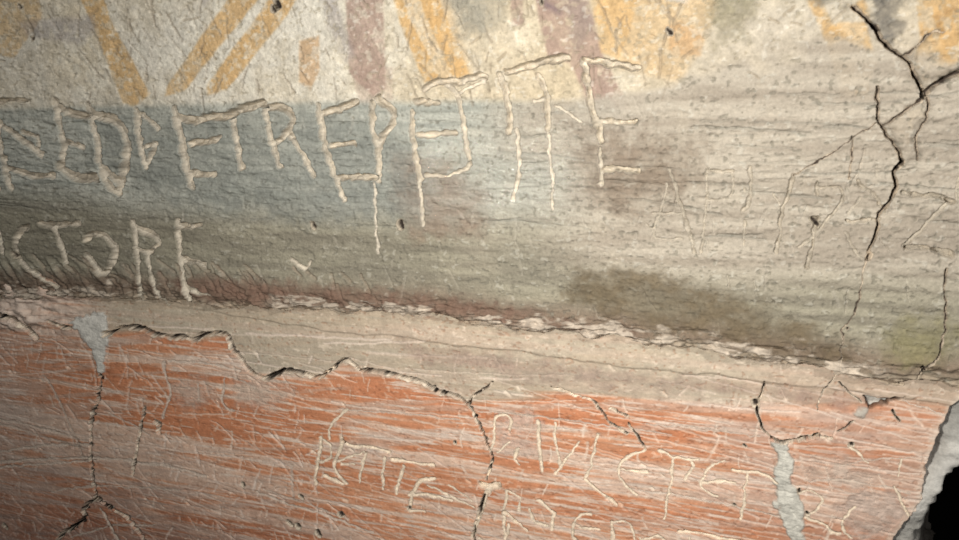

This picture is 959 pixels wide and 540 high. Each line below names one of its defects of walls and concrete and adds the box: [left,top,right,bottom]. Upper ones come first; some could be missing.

crack [755,5,959,445]
spalling [273,295,432,316]
crack [0,312,72,340]
spalling [479,313,670,347]
spalling [712,341,873,379]
crack [102,323,494,540]
crack [56,373,146,540]